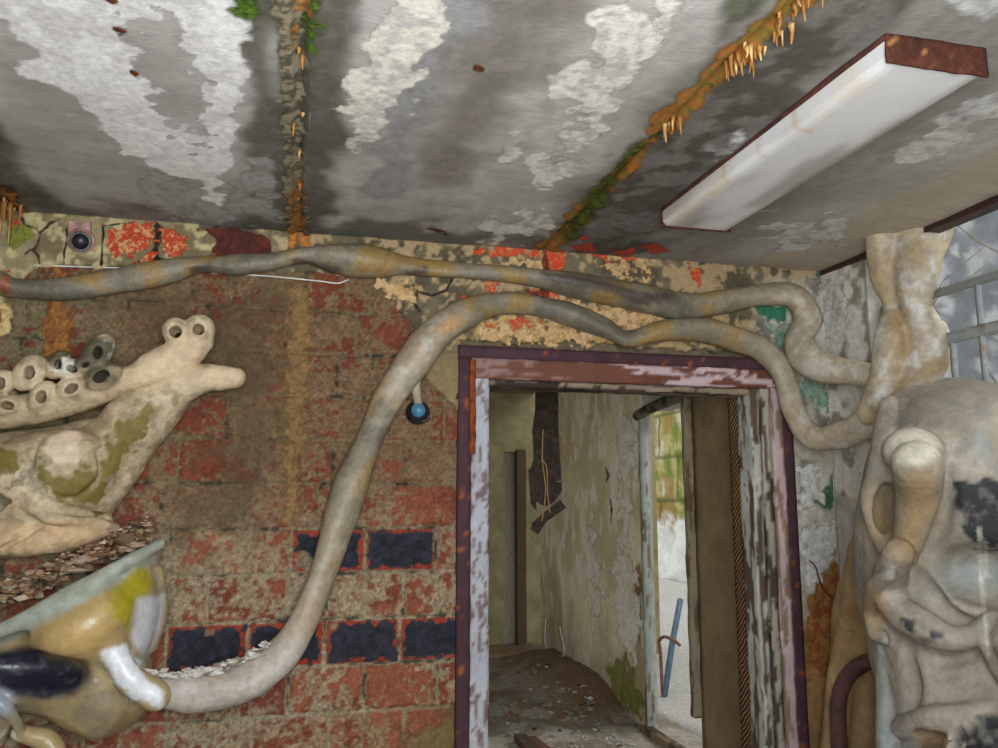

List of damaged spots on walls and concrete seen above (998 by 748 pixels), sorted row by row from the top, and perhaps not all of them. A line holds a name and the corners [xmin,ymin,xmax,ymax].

crack [20,217,68,265]
peeling [0,0,288,279]
damp [234,0,290,231]
damp [299,0,537,245]
damp [453,0,574,136]
spalling [0,270,457,748]
peeling [584,414,643,667]
peeling [795,464,836,587]
rust [805,547,838,675]